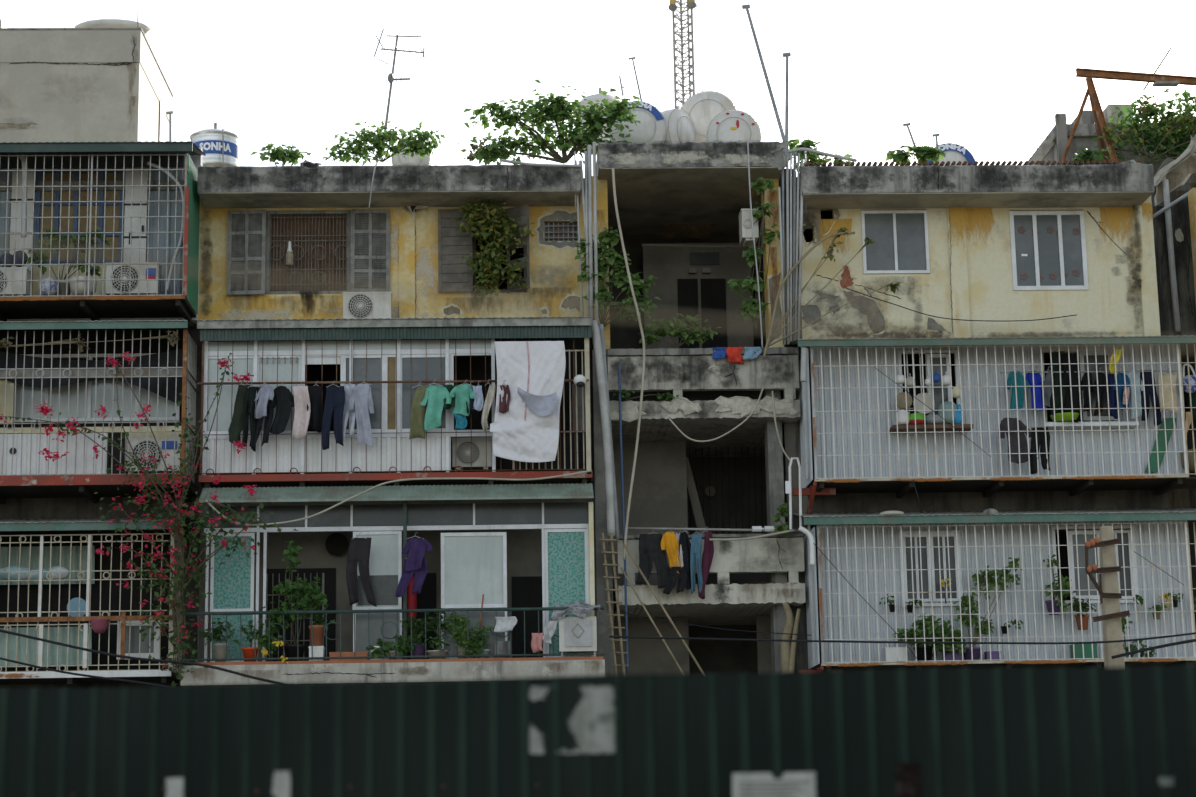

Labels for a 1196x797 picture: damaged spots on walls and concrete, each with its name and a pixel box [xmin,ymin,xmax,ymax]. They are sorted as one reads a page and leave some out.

damp [211,167,309,187]
damp [336,165,375,185]
damp [461,166,505,184]
damp [524,166,568,187]
damp [817,167,880,190]
damp [1046,167,1127,187]
damp [1128,205,1142,328]
damp [612,357,737,386]